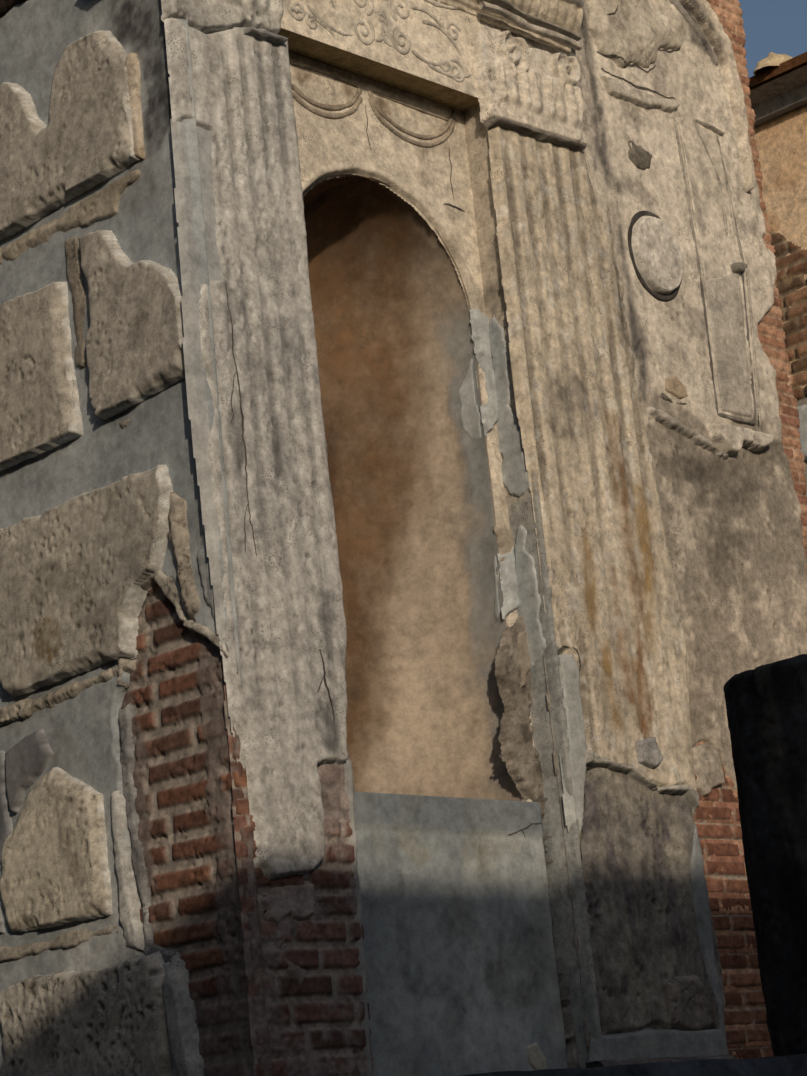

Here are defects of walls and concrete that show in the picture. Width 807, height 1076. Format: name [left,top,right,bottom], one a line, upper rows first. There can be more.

crack [226,285,257,556]
flaking render [117,570,374,1076]
crack [317,649,335,723]
flaking render [580,737,774,1059]